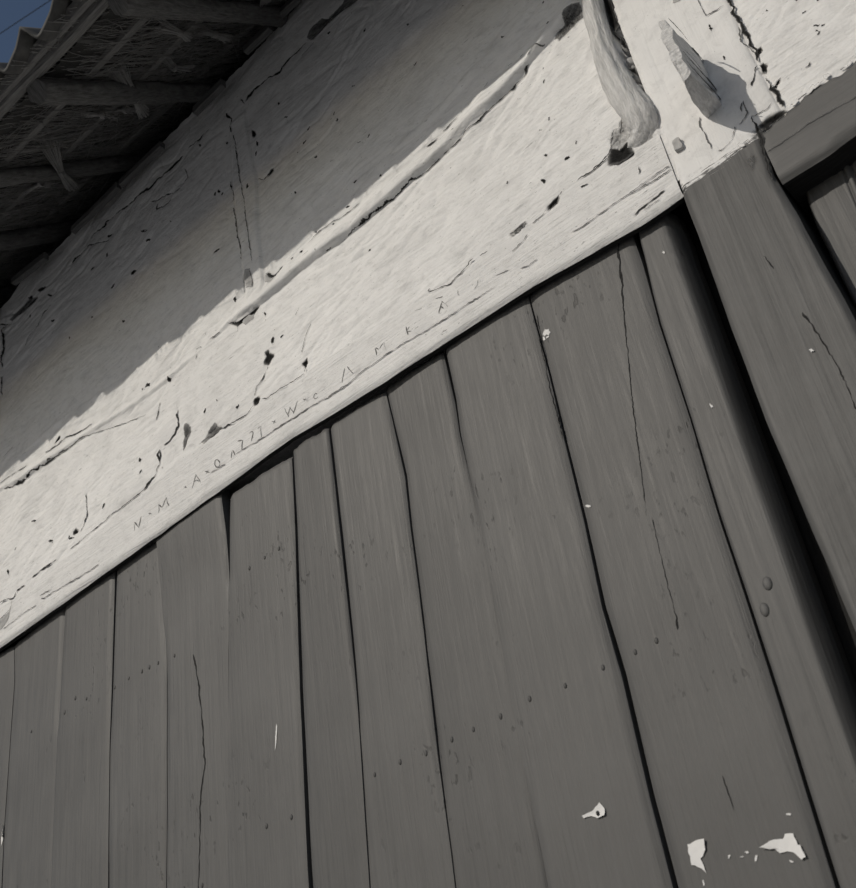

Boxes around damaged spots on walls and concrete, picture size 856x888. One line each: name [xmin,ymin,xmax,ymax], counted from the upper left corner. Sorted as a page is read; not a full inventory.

flaking render [554,2,583,40]
crack [72,130,208,263]
crack [226,42,314,293]
crack [304,43,545,254]
crack [669,0,785,179]
crack [0,306,50,394]
flaking render [183,423,191,450]
flaking render [201,423,222,443]
crack [0,404,179,628]